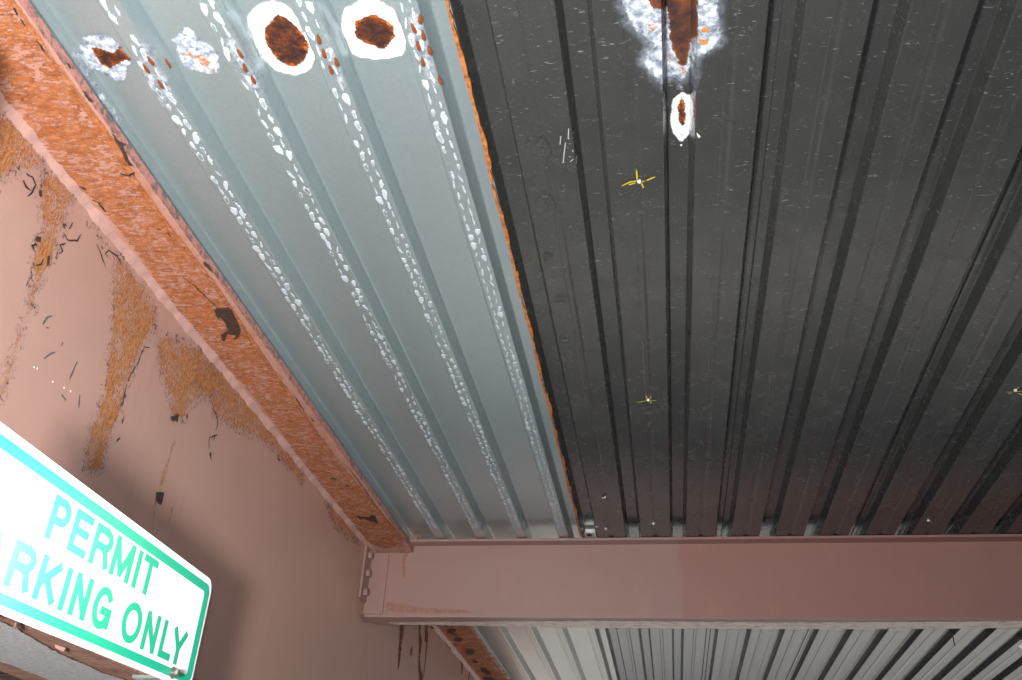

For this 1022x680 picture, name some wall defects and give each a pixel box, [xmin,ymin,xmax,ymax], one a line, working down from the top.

corrosion [619,0,724,141]
spalling [112,134,133,166]
peeling [214,308,241,341]
corrosion [0,0,477,548]
corrosion [248,0,563,529]
corrosion [398,625,511,680]